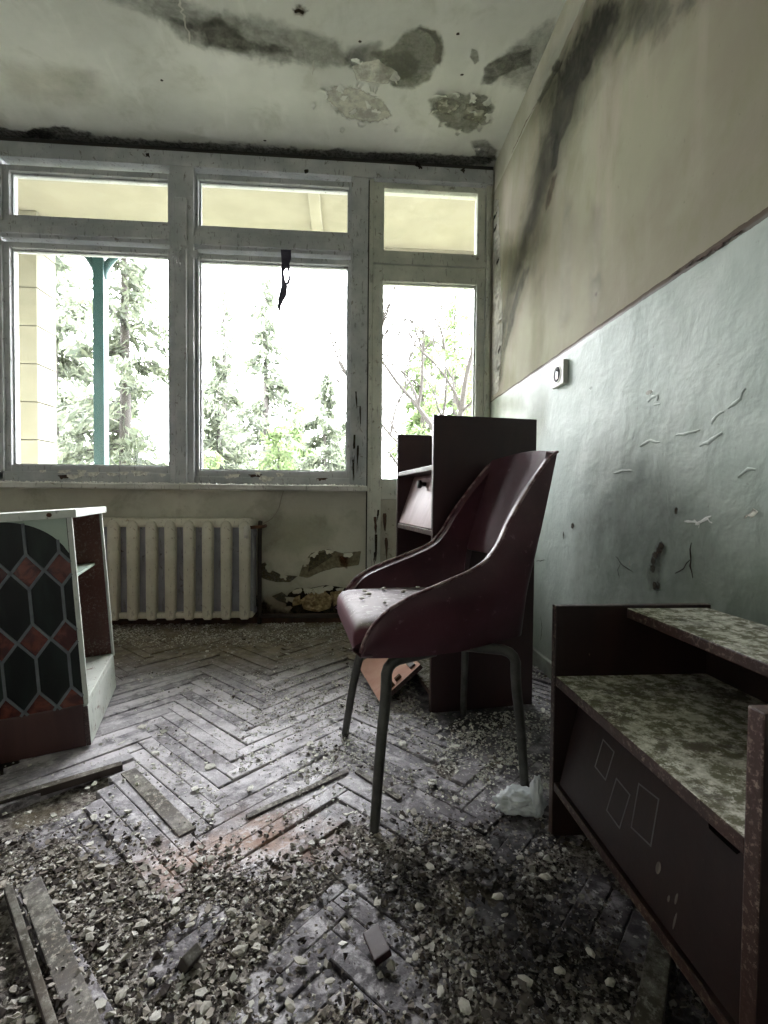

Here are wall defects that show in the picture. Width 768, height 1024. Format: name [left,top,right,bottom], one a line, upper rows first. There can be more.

damp [183,19,281,52]
peeling [318,58,401,133]
damp [373,28,443,87]
peeling [430,92,496,136]
damp [471,50,531,83]
damp [502,8,619,333]
spalling [256,549,361,613]
crack [675,543,693,578]